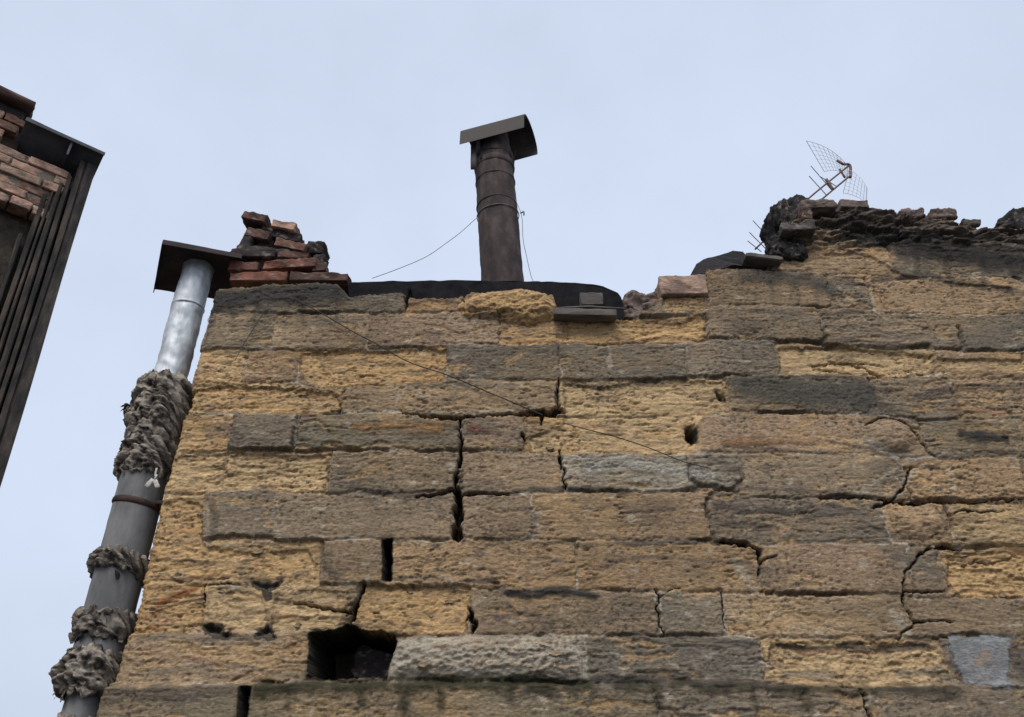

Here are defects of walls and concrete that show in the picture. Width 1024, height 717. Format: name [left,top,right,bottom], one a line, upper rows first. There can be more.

crack [510,380,561,442]
crack [419,416,504,543]
crack [558,453,567,490]
crack [820,417,1023,515]
crack [301,588,366,643]
crack [655,588,680,636]
crack [719,541,776,576]
crack [901,545,1007,631]